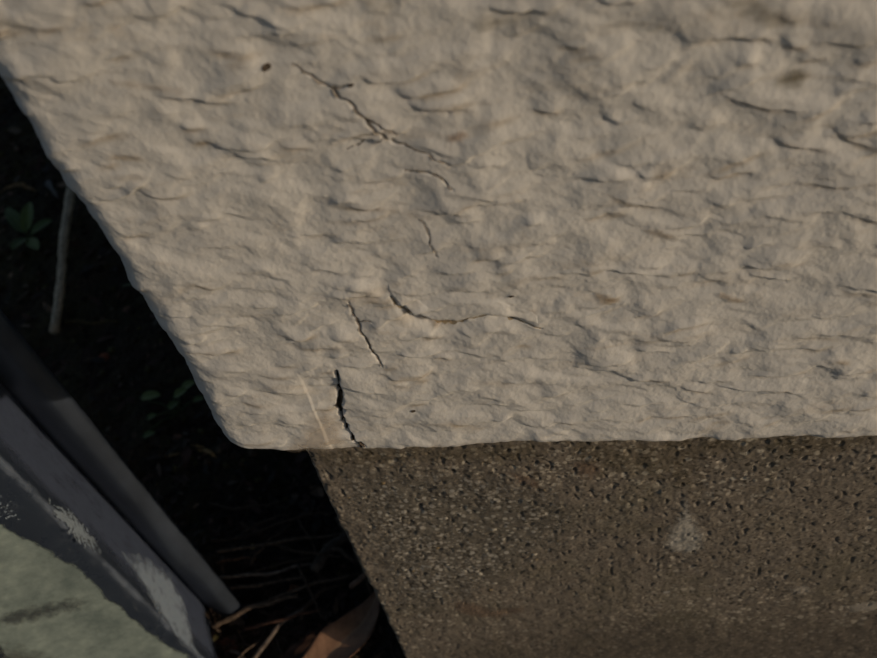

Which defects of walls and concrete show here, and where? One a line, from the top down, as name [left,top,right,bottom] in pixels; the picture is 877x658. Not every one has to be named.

crack [291,64,453,190]
crack [348,304,382,367]
crack [335,370,366,448]